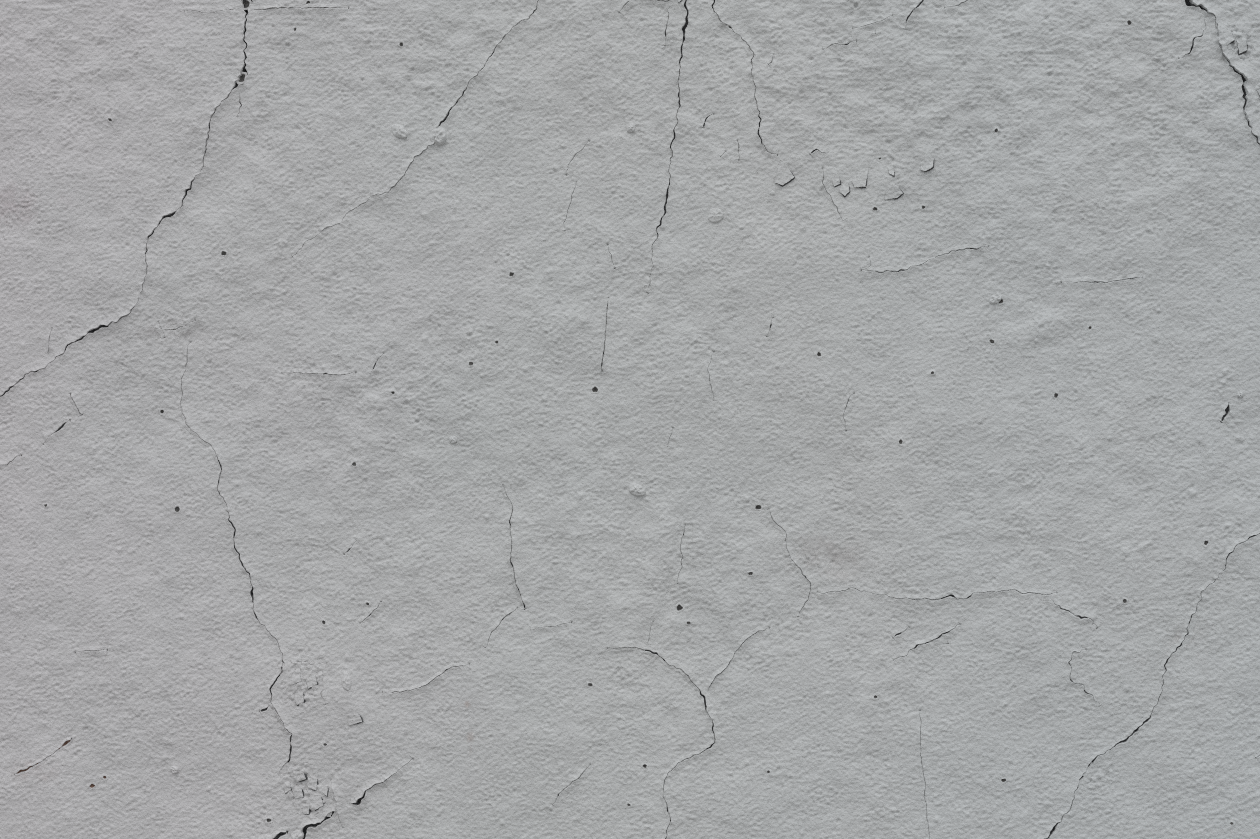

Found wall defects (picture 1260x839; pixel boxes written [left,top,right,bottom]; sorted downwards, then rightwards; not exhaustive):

crack [616,0,828,293]
crack [822,0,977,54]
crack [1178,0,1260,150]
crack [860,242,988,279]
crack [1062,273,1142,290]
crack [0,0,572,839]
crack [1218,403,1236,425]
crack [608,507,1104,839]
crack [1037,529,1260,839]